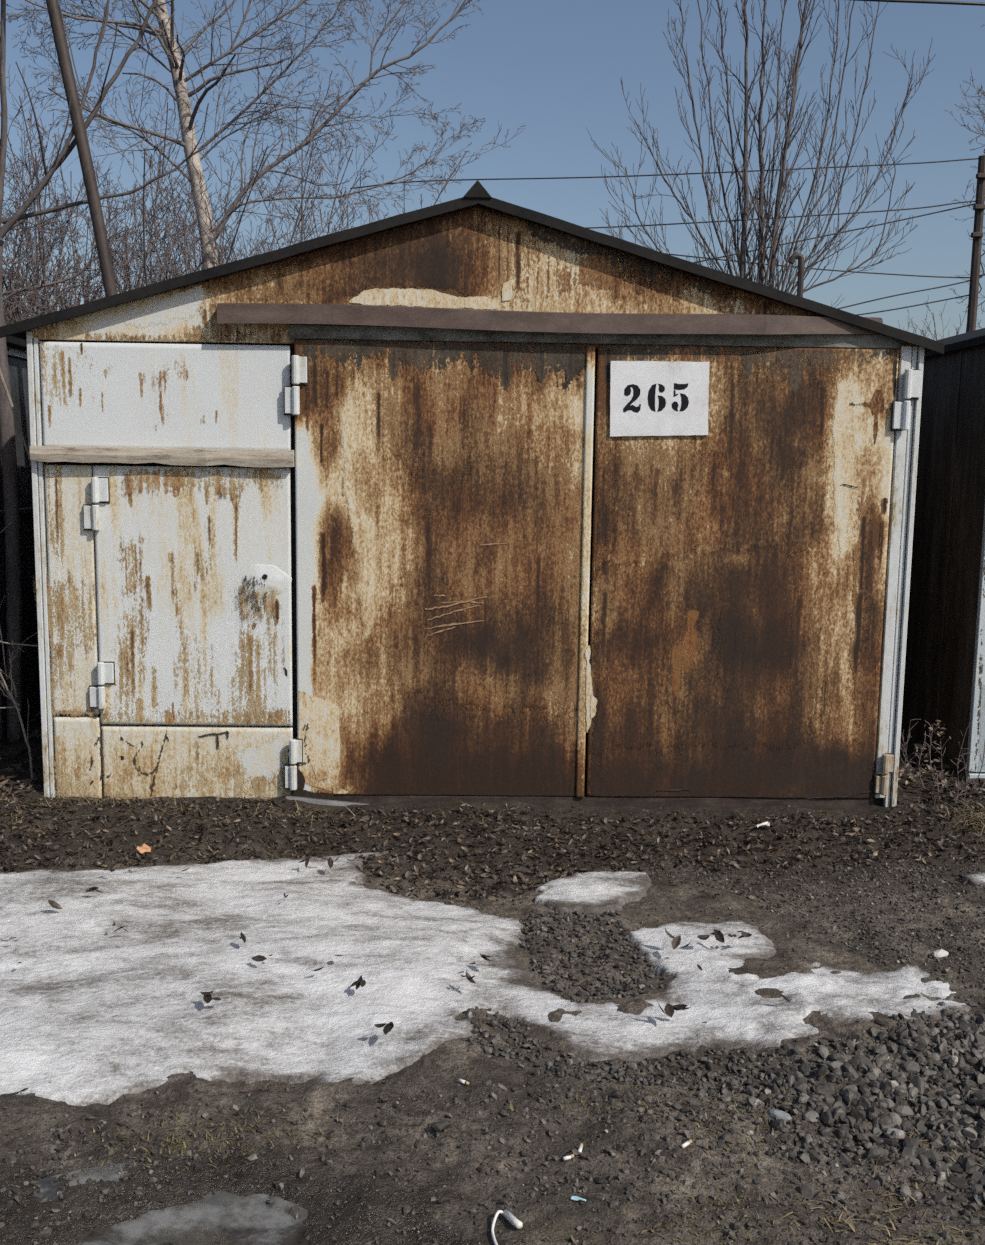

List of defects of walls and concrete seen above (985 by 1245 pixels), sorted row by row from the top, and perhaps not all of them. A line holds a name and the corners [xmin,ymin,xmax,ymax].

corrosion [240,208,696,309]
corrosion [710,291,776,314]
corrosion [41,300,295,430]
corrosion [849,389,884,444]
corrosion [44,466,290,725]
corrosion [304,342,838,796]
corrosion [849,491,888,727]
peeling [585,645,597,732]
corrosion [53,736,95,798]
corrosion [174,742,284,798]